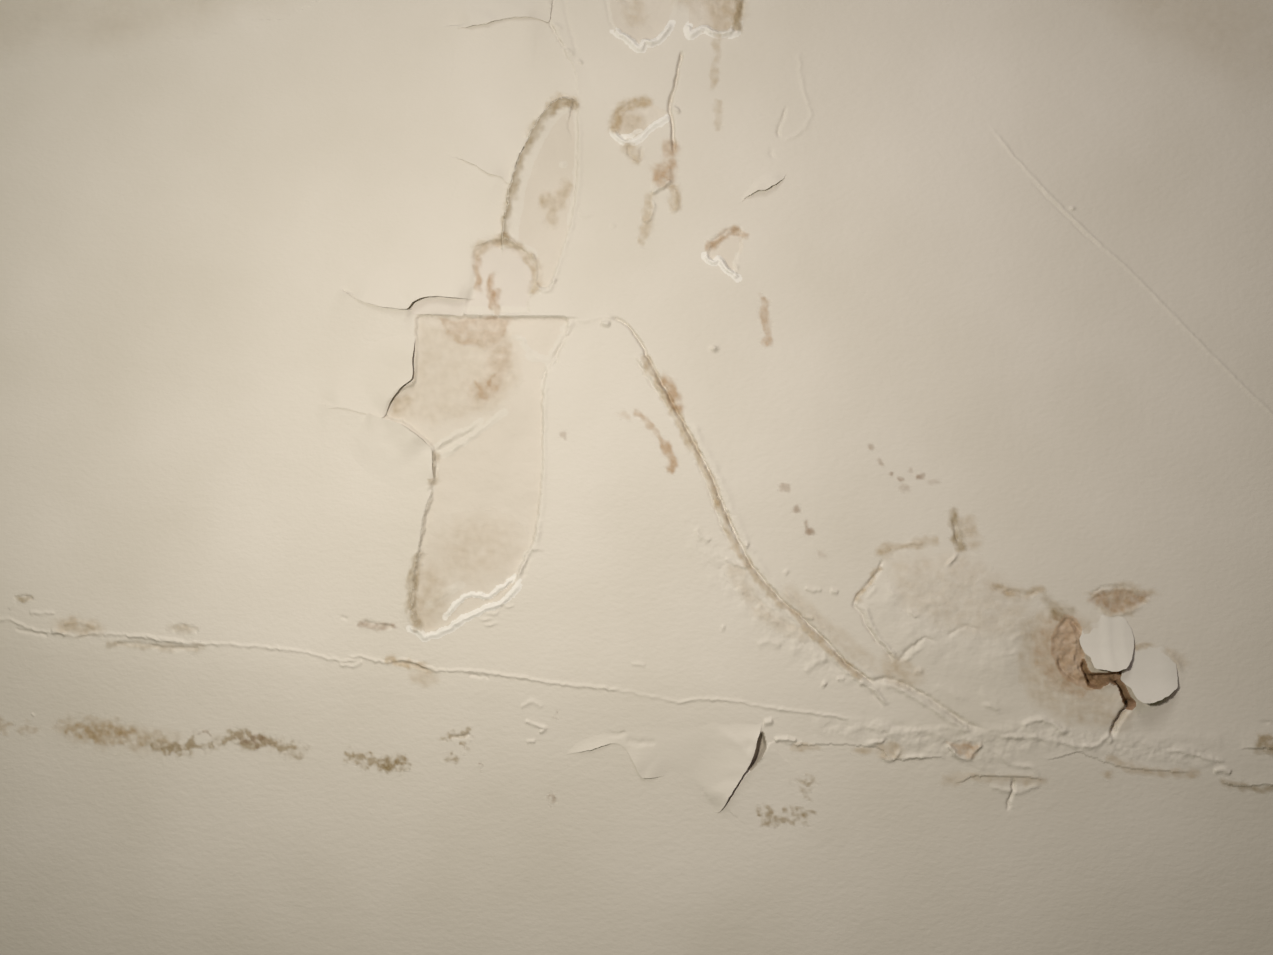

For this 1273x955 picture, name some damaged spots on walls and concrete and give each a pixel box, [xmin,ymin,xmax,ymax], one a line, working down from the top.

peeling [318,0,598,642]
crack [0,311,994,746]
peeling [566,716,794,826]
spalling [1028,582,1189,751]
crack [1112,724,1238,778]